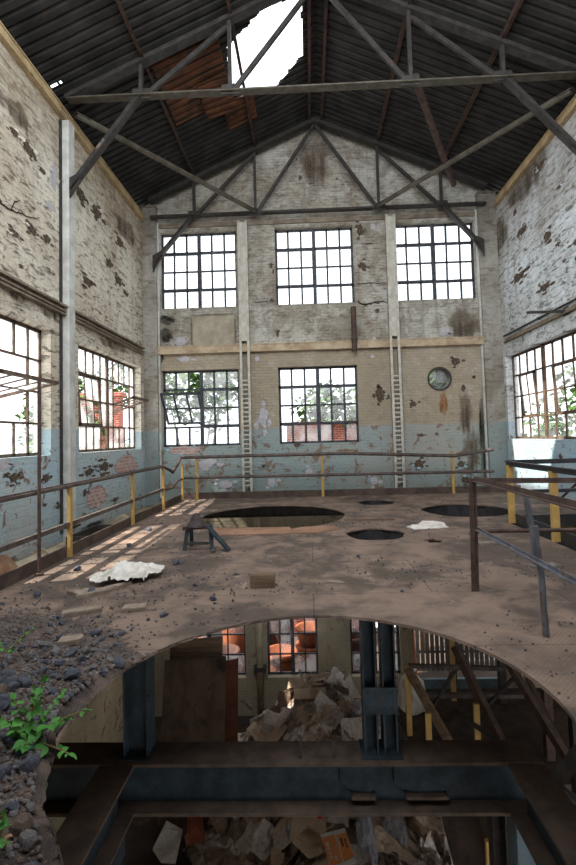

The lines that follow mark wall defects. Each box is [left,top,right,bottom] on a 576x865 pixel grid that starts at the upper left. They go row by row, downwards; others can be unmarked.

peeling [0,126,60,191]
crack [0,200,40,219]
peeling [6,219,54,247]
peeling [76,187,126,250]
peeling [541,225,576,263]
peeling [81,270,96,289]
peeling [103,254,130,298]
peeling [510,265,530,285]
peeling [535,281,555,295]
peeling [372,384,390,406]
peeling [0,458,24,487]
flaking render [79,455,139,511]